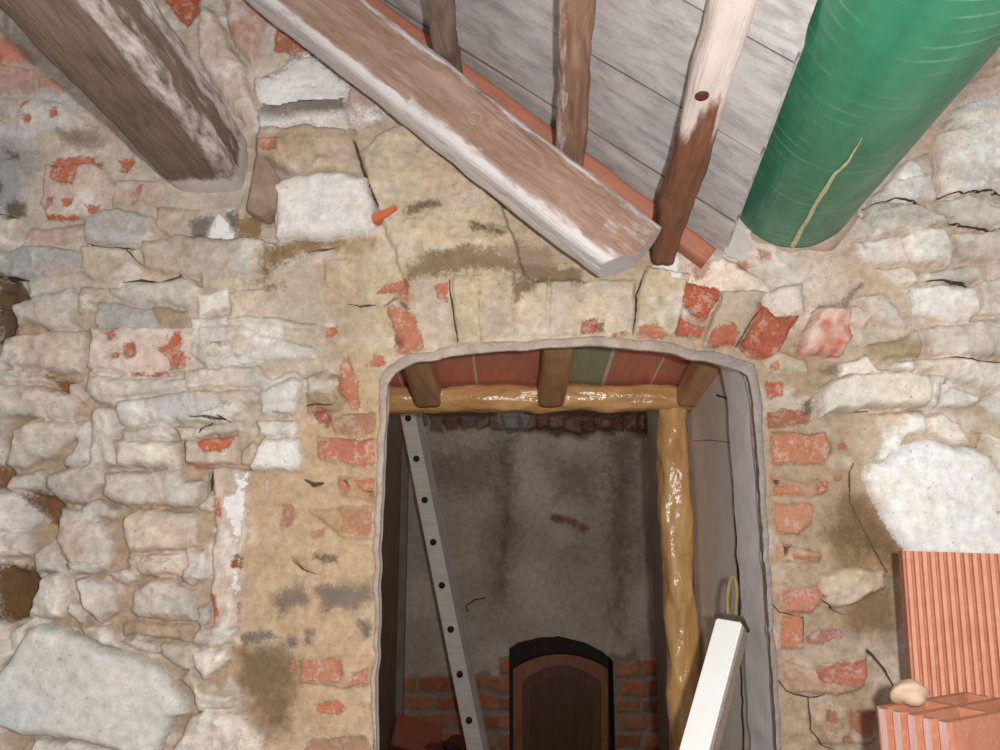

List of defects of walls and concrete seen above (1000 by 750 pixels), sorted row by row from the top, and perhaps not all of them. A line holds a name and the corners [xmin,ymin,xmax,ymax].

crack [354,141,378,207]
leakage [408,200,442,213]
crack [862,189,1000,210]
crack [949,223,1000,232]
leakage [407,243,584,302]
crack [633,269,646,333]
corrosion [551,515,587,532]
crack [848,463,887,572]
crack [698,371,835,750]